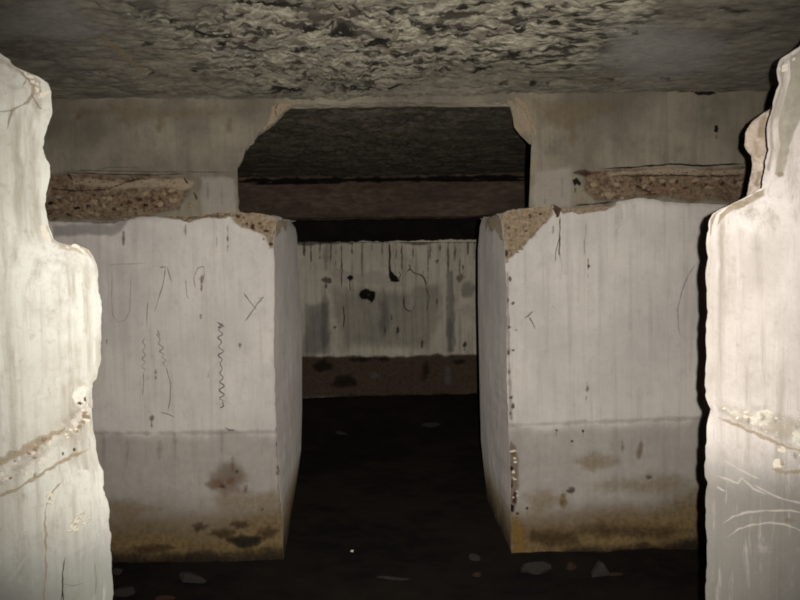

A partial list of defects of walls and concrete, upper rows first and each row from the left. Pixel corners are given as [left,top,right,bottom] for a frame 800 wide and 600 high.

spalling [135,0,662,95]
spalling [485,52,800,262]
spalling [40,172,287,247]
water stain [302,348,480,399]
spalling [0,384,93,496]
water stain [110,510,284,563]
water stain [511,495,707,553]